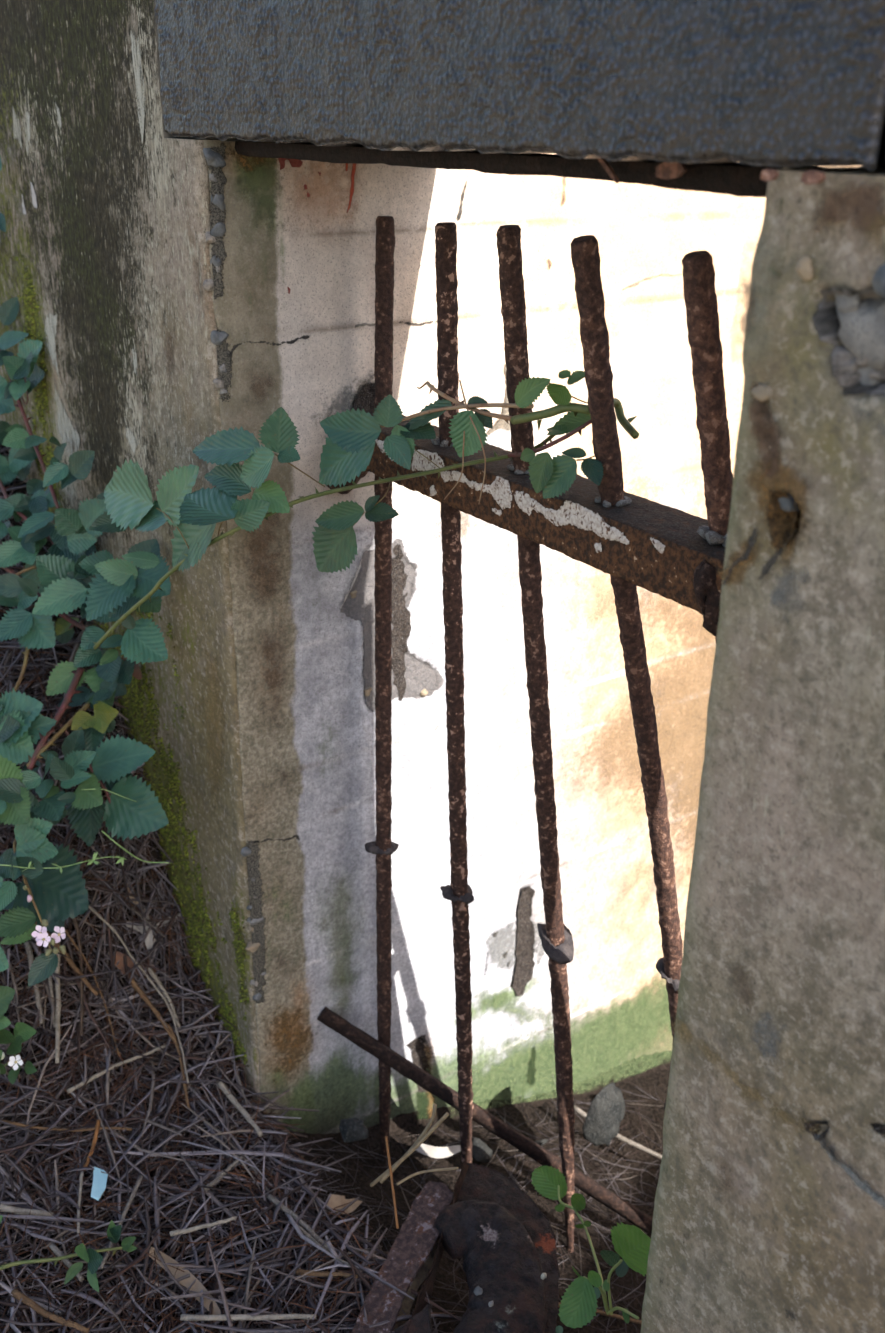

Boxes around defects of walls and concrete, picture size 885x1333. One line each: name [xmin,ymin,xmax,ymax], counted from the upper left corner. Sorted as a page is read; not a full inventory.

leakage [12,107,31,154]
leakage [131,31,146,142]
leakage [22,182,37,215]
spalling [812,264,885,397]
leakage [44,312,80,457]
leakage [126,427,140,453]
corrosion [749,384,780,478]
spalling [340,539,444,712]
spalling [485,886,544,996]
leakage [513,1047,536,1102]
crack [811,1127,885,1208]